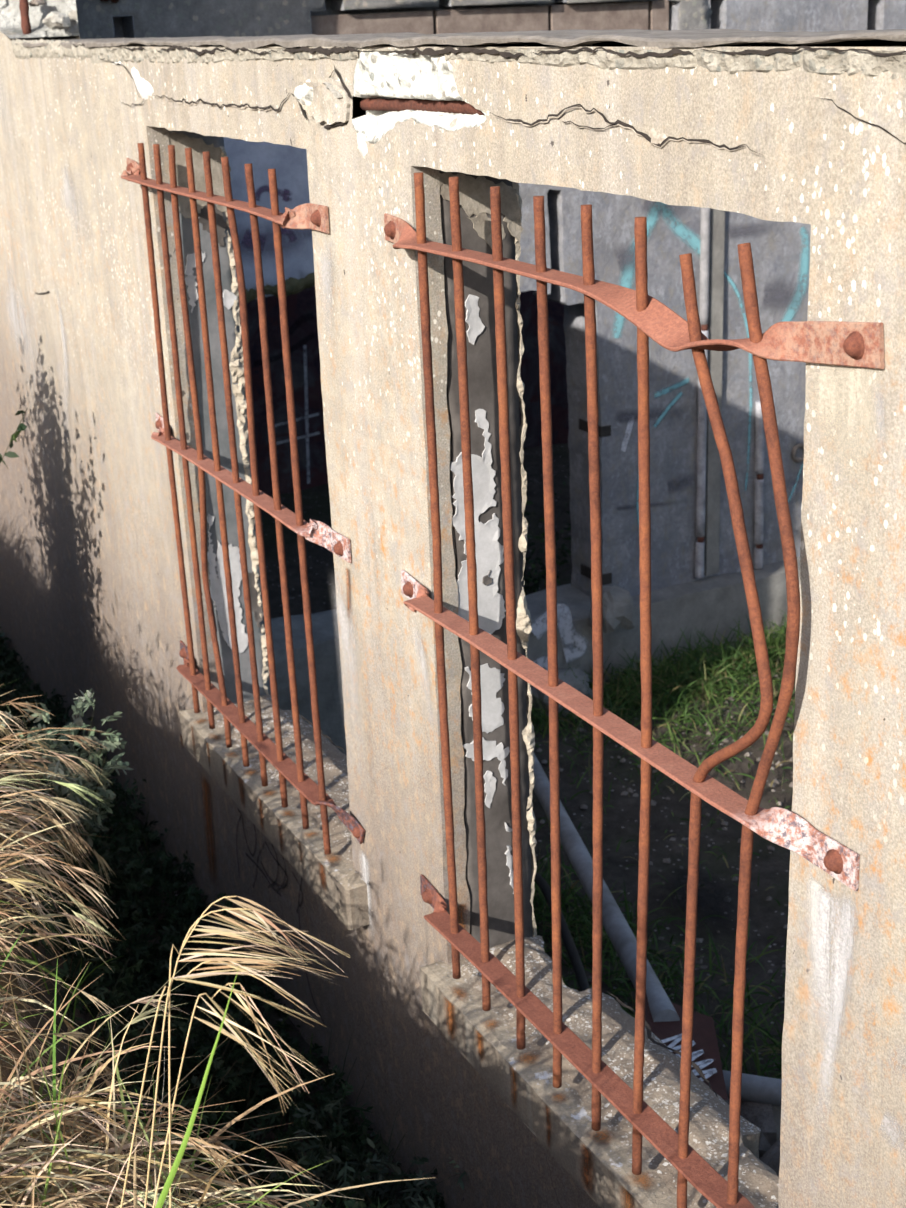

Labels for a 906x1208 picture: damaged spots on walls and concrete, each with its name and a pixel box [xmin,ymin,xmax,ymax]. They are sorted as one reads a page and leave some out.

flaking render [0,0,325,61]
crack [59,44,357,120]
spalling [294,51,486,156]
crack [490,104,760,156]
crack [386,46,906,58]
crack [821,98,906,144]
peeling [434,170,532,657]
peeling [463,663,510,808]
rust [180,719,255,875]
spalling [522,682,537,936]
rust [447,989,464,1035]
rust [583,1131,610,1188]